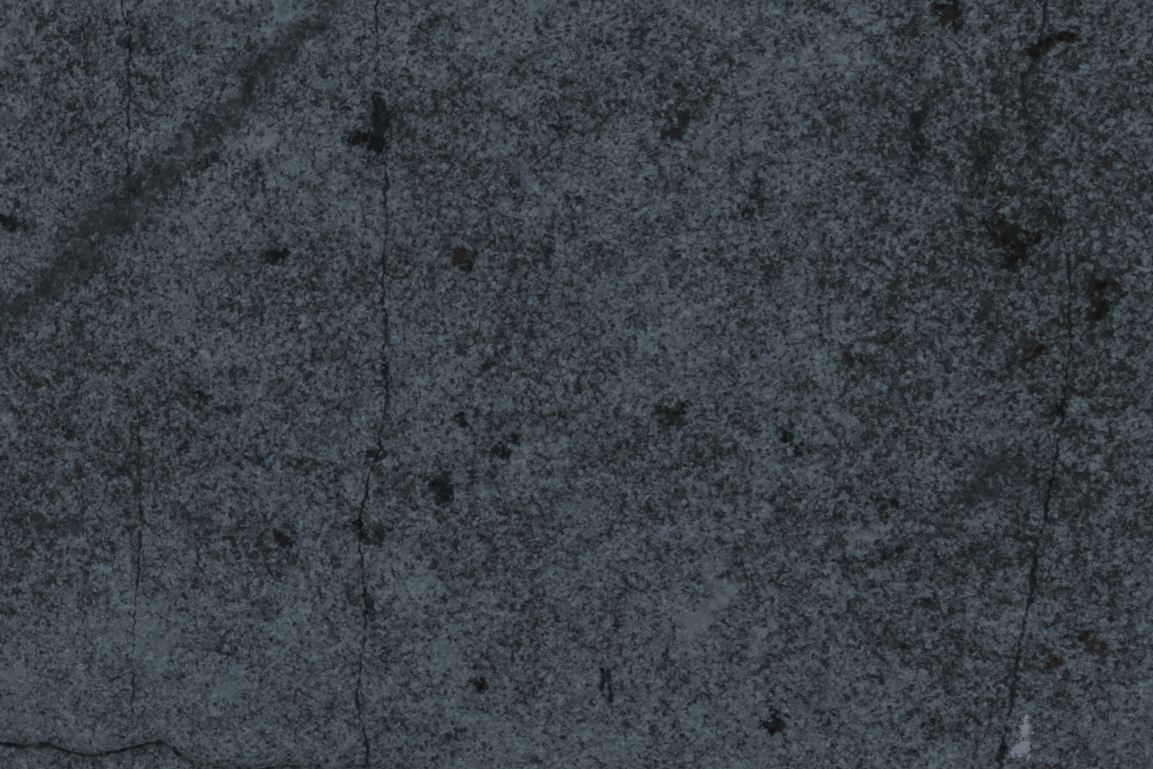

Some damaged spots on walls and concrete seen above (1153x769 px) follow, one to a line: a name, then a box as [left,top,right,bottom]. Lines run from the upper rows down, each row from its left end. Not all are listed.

damp [0,0,345,346]
crack [371,0,380,122]
crack [355,151,389,766]
crack [995,0,1073,769]
crack [0,741,183,758]